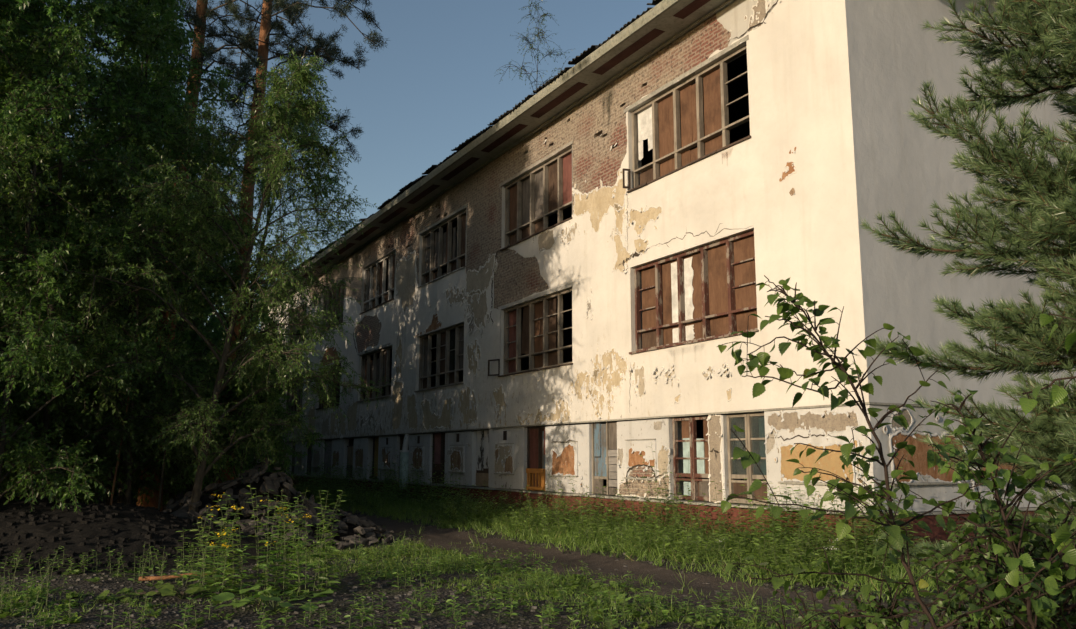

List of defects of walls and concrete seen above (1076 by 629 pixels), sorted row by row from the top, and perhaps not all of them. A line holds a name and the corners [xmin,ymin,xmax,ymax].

flaking render [308,0,781,353]
peeling [779,147,797,196]
crack [622,193,747,266]
peeling [390,374,406,431]
peeling [517,343,682,427]
peeling [546,443,582,487]
flaking render [616,444,670,499]
peeling [764,407,869,499]
peeling [883,406,1038,490]